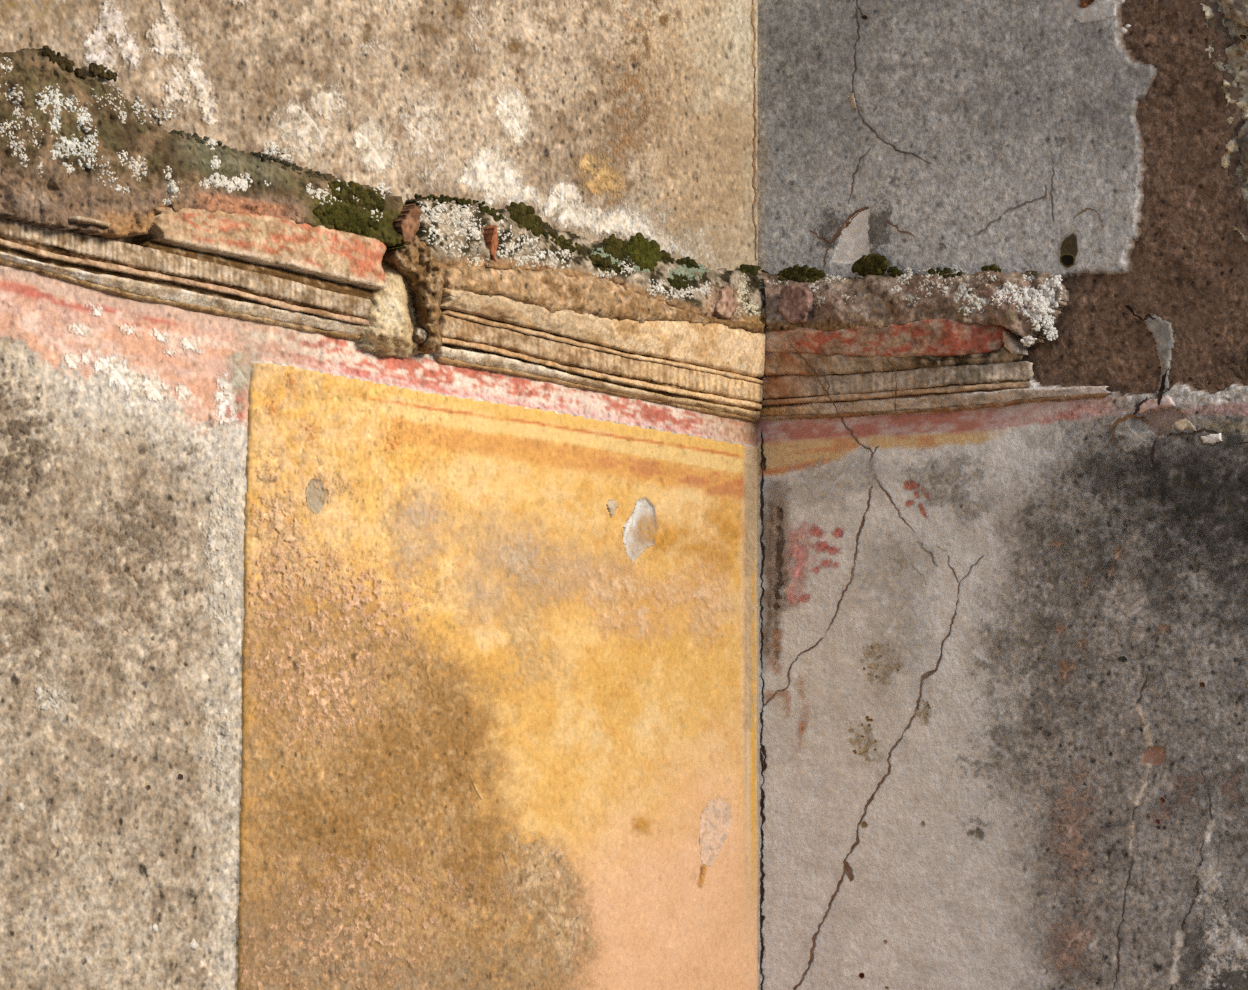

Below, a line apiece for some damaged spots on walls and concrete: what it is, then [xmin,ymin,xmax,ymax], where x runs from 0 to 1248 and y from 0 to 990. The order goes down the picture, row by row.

damp [84,0,218,125]
crack [809,0,932,268]
flaking render [1018,0,1248,453]
damp [0,437,597,990]
flaking render [606,498,657,562]
crack [760,344,984,990]
damp [955,418,1248,848]
crack [1113,768,1150,989]
crack [1136,677,1147,711]
crack [1169,771,1213,990]
damp [1168,692,1248,990]